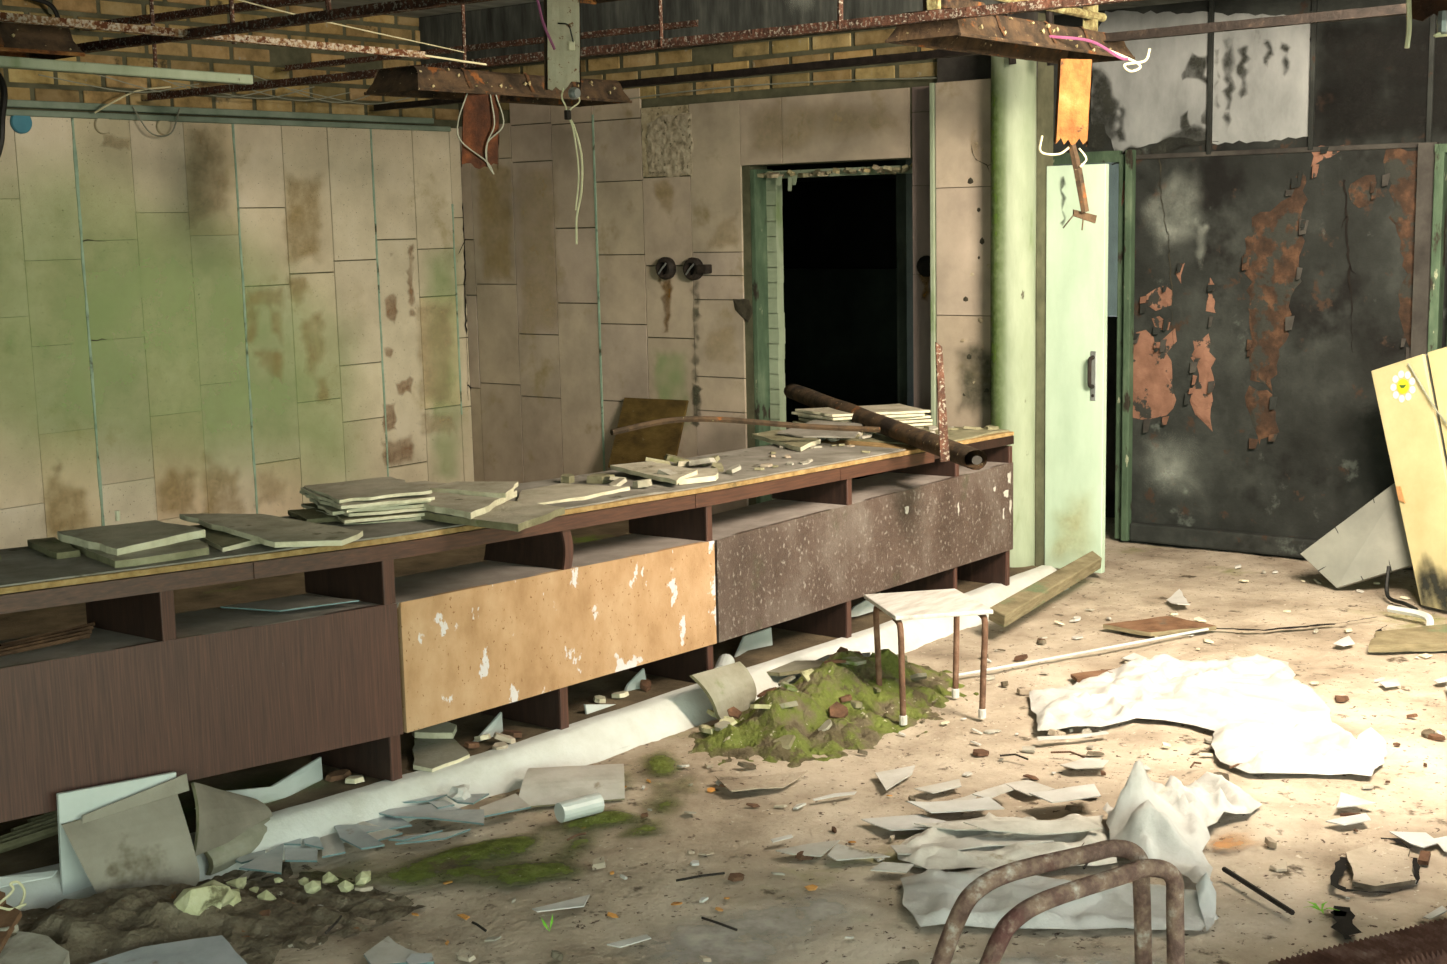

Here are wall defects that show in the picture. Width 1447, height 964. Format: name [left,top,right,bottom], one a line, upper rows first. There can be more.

water stain [1089,69,1206,155]
water stain [1224,47,1248,122]
water stain [1265,41,1289,69]
peeling [1091,10,1344,449]
water stain [387,281,413,320]
water stain [384,406,396,429]
water stain [692,361,701,426]